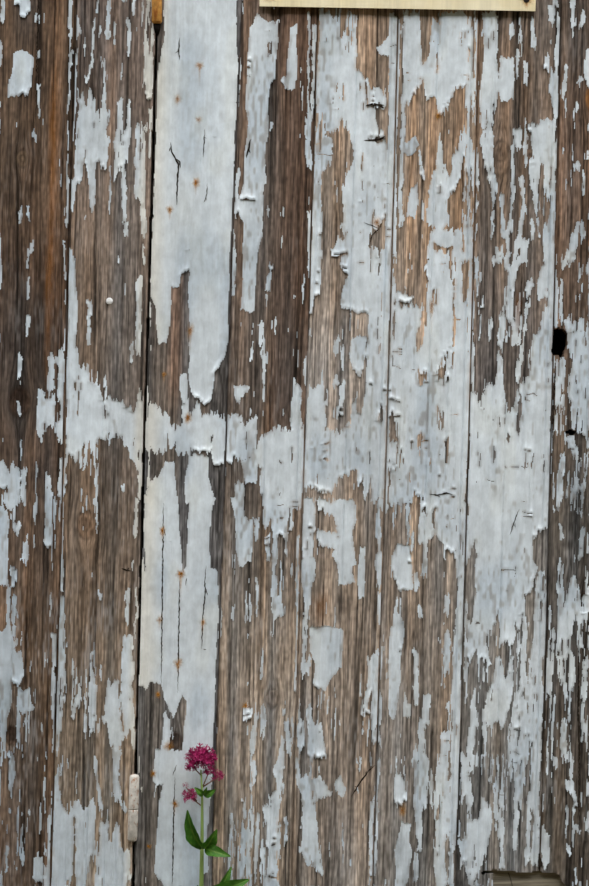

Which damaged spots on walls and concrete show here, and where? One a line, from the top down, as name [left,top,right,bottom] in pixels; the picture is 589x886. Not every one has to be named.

peeling [0,0,45,24]
peeling [0,40,44,121]
peeling [64,0,131,237]
peeling [134,106,153,238]
peeling [26,240,34,300]
peeling [139,0,589,886]
peeling [0,439,38,886]
peeling [32,755,132,886]